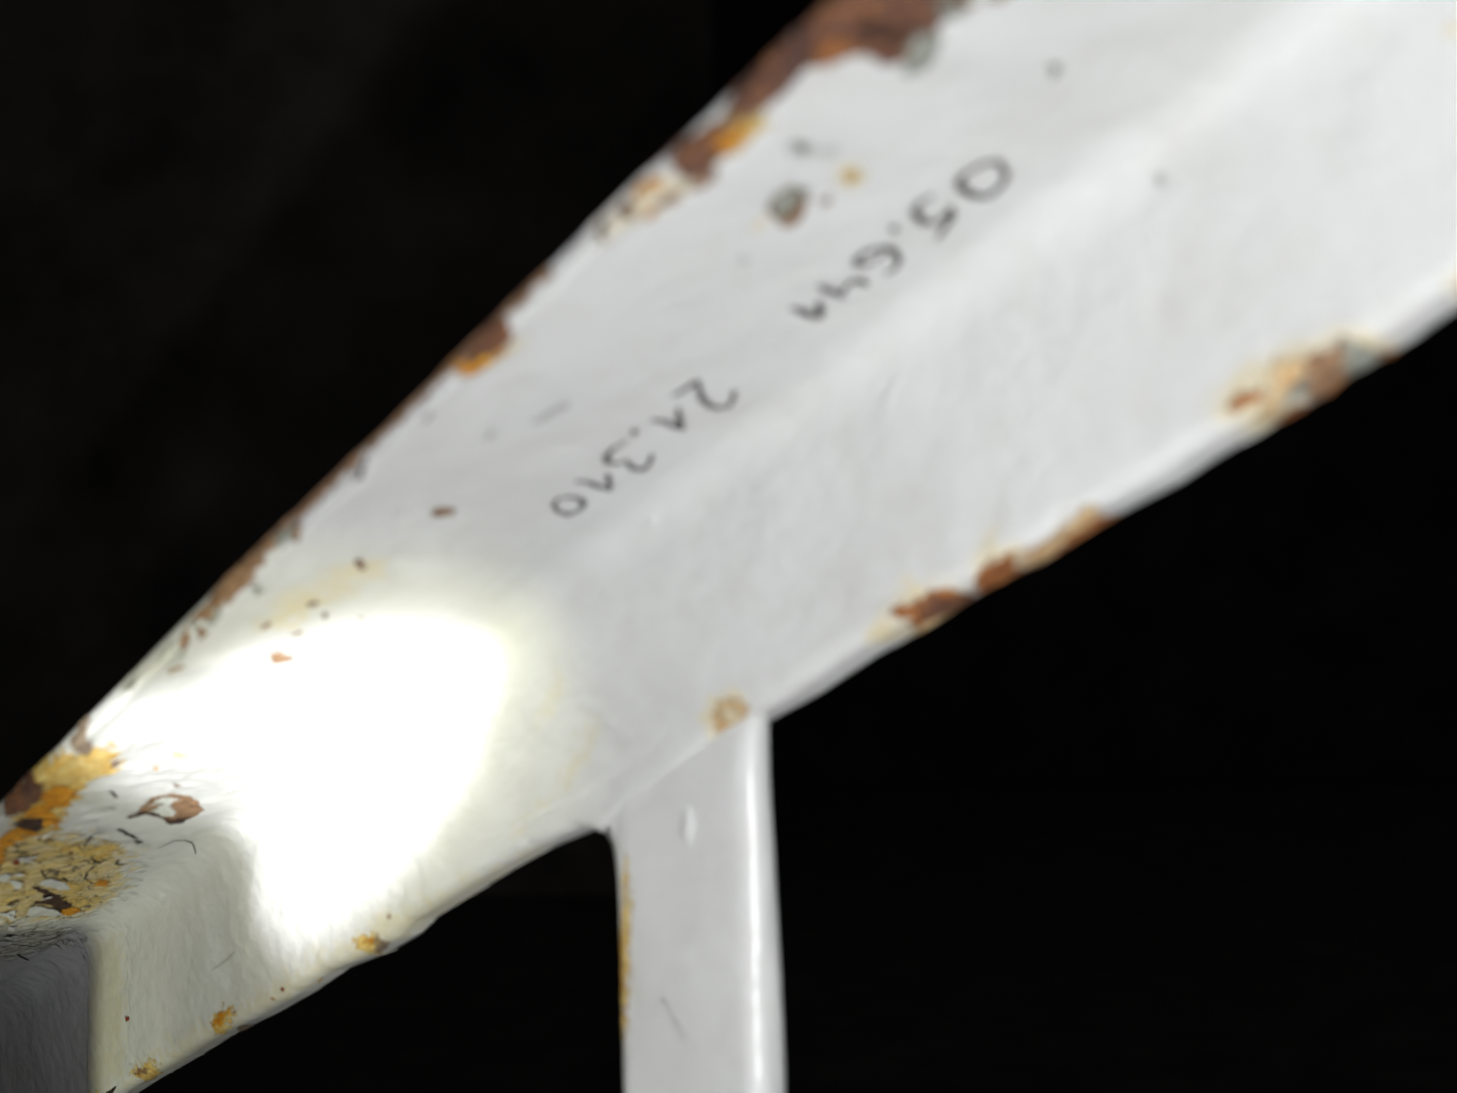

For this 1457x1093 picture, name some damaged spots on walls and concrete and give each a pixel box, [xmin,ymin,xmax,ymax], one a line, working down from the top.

rust [585,64,796,254]
rust [824,156,879,198]
rust [1192,310,1423,445]
rust [189,265,552,642]
rust [852,506,1117,650]
rust [691,676,755,747]
peeling [127,783,205,825]
peeling [0,856,86,962]